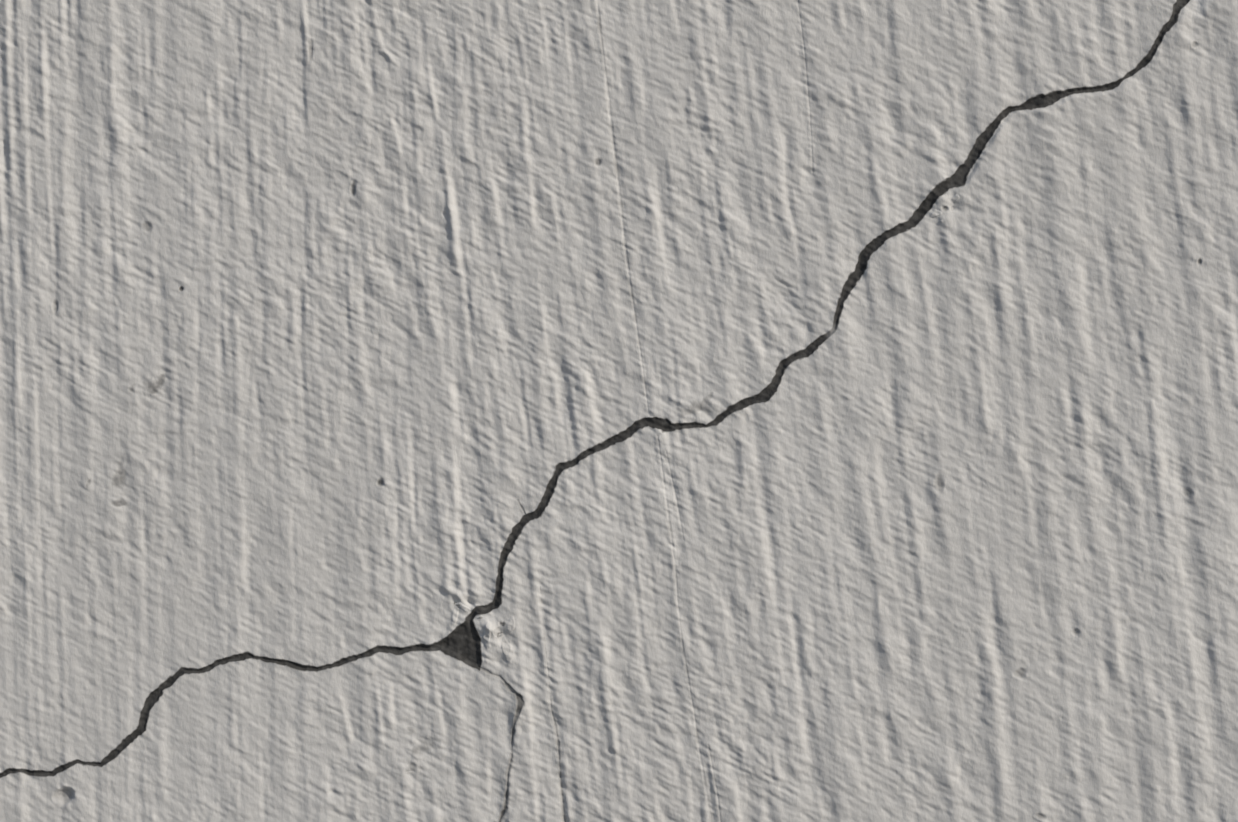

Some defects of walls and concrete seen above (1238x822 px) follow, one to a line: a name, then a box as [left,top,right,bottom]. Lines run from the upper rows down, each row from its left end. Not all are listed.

crack [464,0,1192,619]
crack [0,640,437,780]
crack [480,580,568,822]